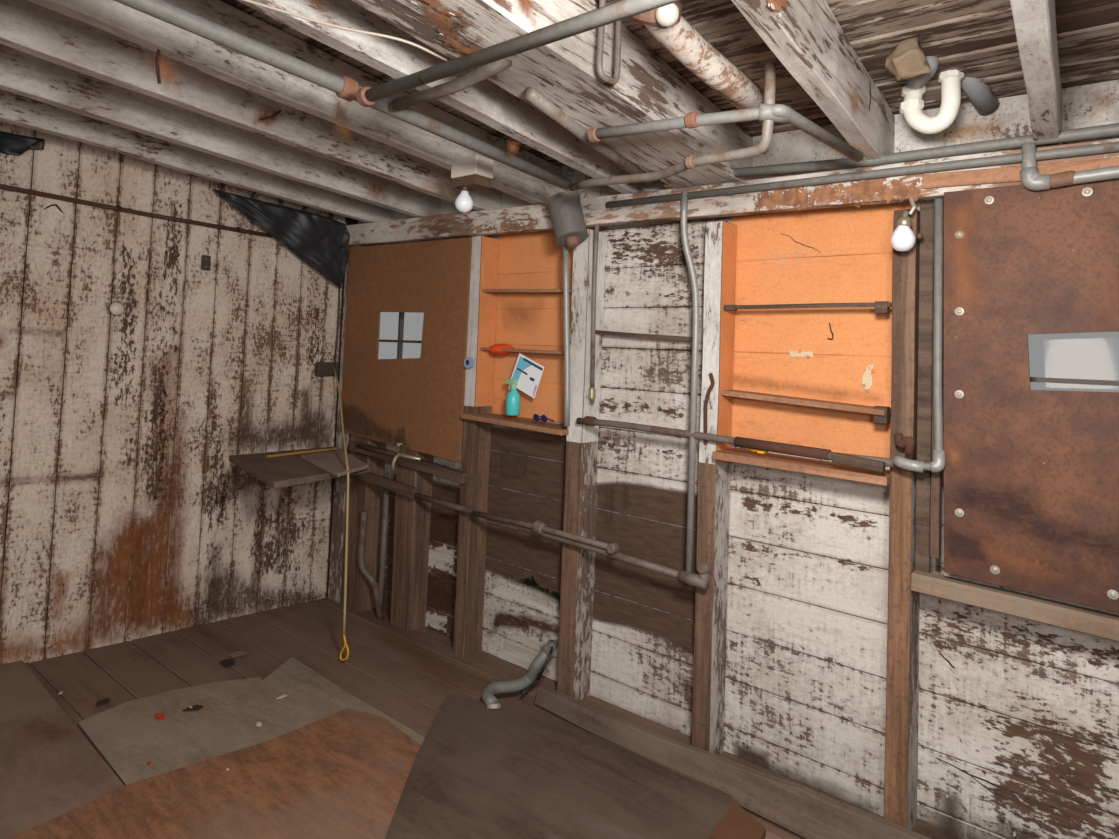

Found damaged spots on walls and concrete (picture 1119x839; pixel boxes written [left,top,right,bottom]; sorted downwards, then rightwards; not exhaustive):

peeling [604,226,702,302]
peeling [108,197,183,503]
water stain [232,390,329,450]
peeling [599,395,684,421]
rust [0,393,196,659]
water stain [216,469,264,508]
water stain [202,522,312,622]
peeling [235,503,312,592]
peeling [741,470,877,531]
spalling [498,629,558,671]
peeling [919,608,1119,675]
peeling [941,695,1119,839]